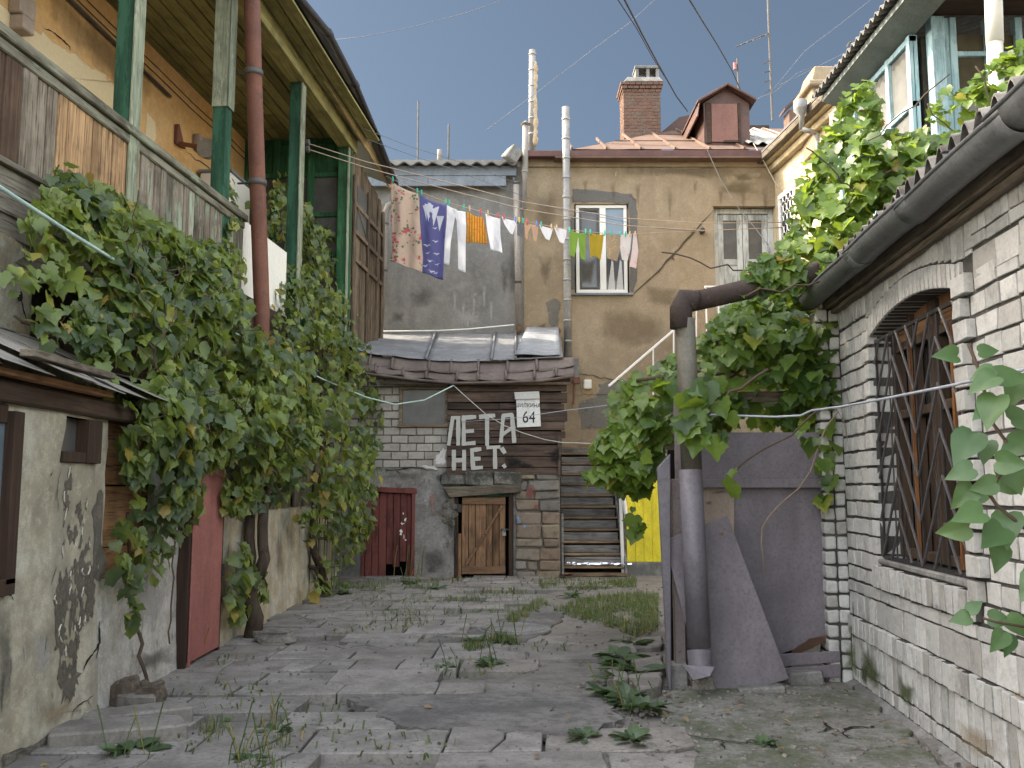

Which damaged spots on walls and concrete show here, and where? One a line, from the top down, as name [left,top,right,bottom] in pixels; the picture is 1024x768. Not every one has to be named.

peeling [54,465,107,704]
crack [84,622,101,669]